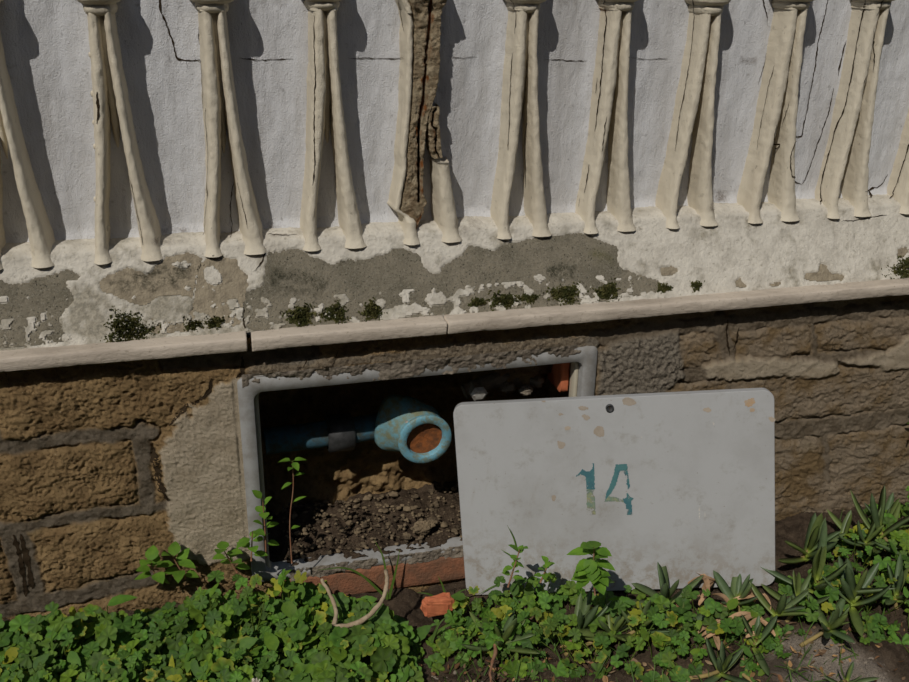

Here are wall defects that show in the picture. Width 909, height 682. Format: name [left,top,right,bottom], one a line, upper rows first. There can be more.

crack [159,0,208,234]
spalling [400,0,447,230]
crack [230,184,247,237]
peeling [0,269,80,348]
peeling [100,233,678,334]